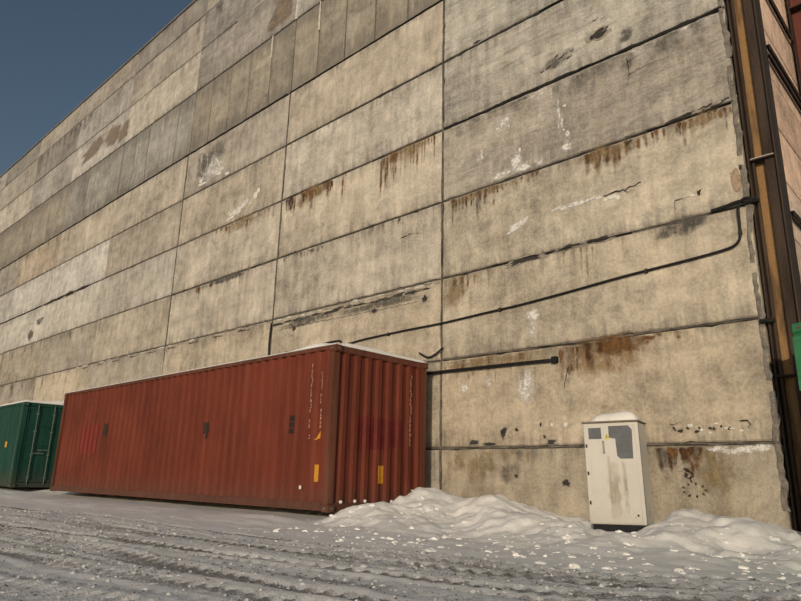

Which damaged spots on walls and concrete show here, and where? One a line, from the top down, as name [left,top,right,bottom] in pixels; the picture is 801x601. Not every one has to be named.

spalling [586,17,611,44]
water stain [514,89,571,152]
corrosion [380,135,435,191]
water stain [492,148,542,180]
corrosion [286,174,346,210]
crack [603,182,640,202]
spalling [76,281,440,369]
corrosion [559,333,662,373]
water stain [518,371,533,401]
spalling [468,425,518,447]
spalling [670,420,751,434]
corrosion [656,447,725,489]